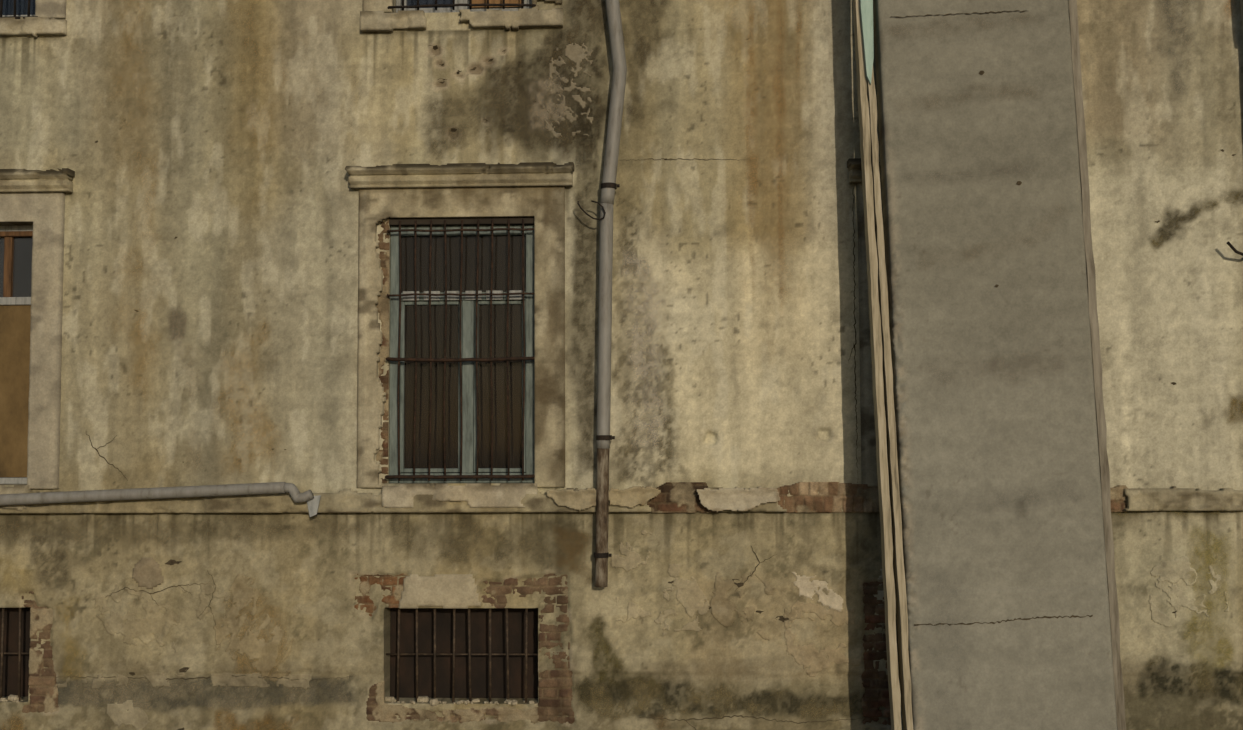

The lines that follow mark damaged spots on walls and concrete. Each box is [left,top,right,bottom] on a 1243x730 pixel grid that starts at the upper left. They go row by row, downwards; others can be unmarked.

leakage [484,0,605,170]
flaking render [534,43,593,138]
leakage [574,193,596,332]
flaking render [376,220,390,483]
flaking render [546,486,661,511]
flaking render [697,487,780,512]
flaking render [22,591,189,730]
flaking render [211,574,311,689]
flaking render [354,573,408,616]
flaking render [366,573,575,724]
flaking render [792,572,843,612]
flaking render [861,569,891,725]